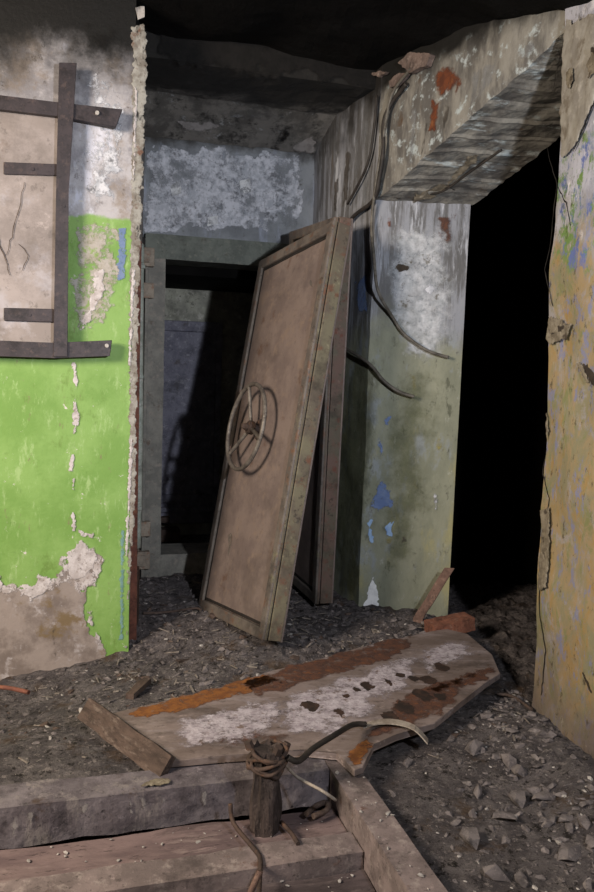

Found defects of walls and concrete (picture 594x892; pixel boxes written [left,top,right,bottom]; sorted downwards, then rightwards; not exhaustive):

rust [428,67,461,131]
crack [0,188,28,275]
peeling [0,512,106,680]